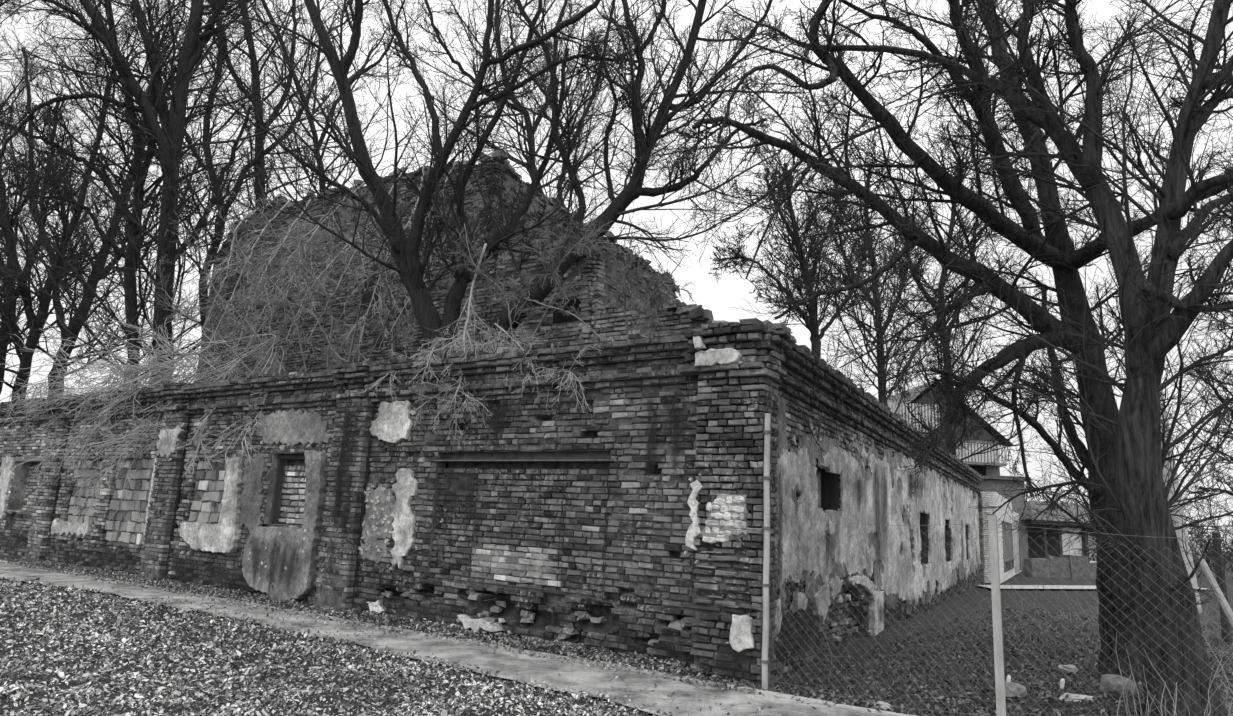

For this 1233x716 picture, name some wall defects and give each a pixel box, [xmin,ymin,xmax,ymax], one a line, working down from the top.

flaking render [246,406,334,451]
spalling [355,468,420,570]
peeling [696,496,749,543]
flaking render [775,395,981,642]
peeling [456,590,535,635]
spalling [558,611,604,640]
spalling [636,631,662,646]
spalling [668,618,693,630]